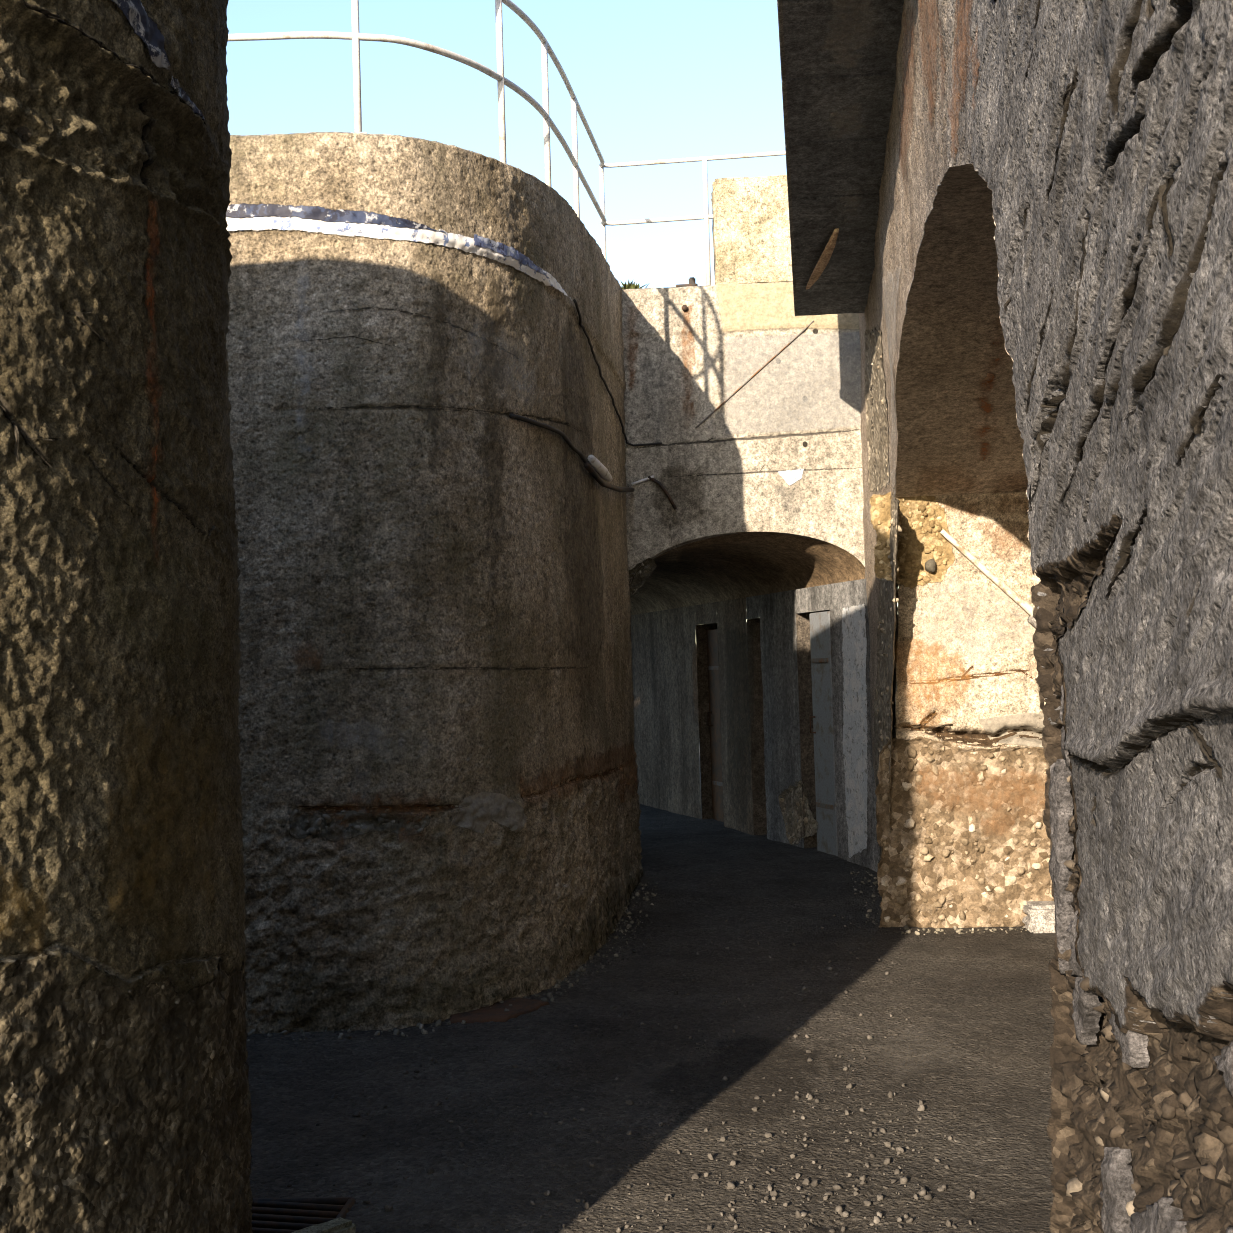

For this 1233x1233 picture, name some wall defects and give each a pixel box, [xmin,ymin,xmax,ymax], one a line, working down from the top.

crack [0,395,60,469]
crack [87,442,215,536]
spalling [842,327,1233,1233]